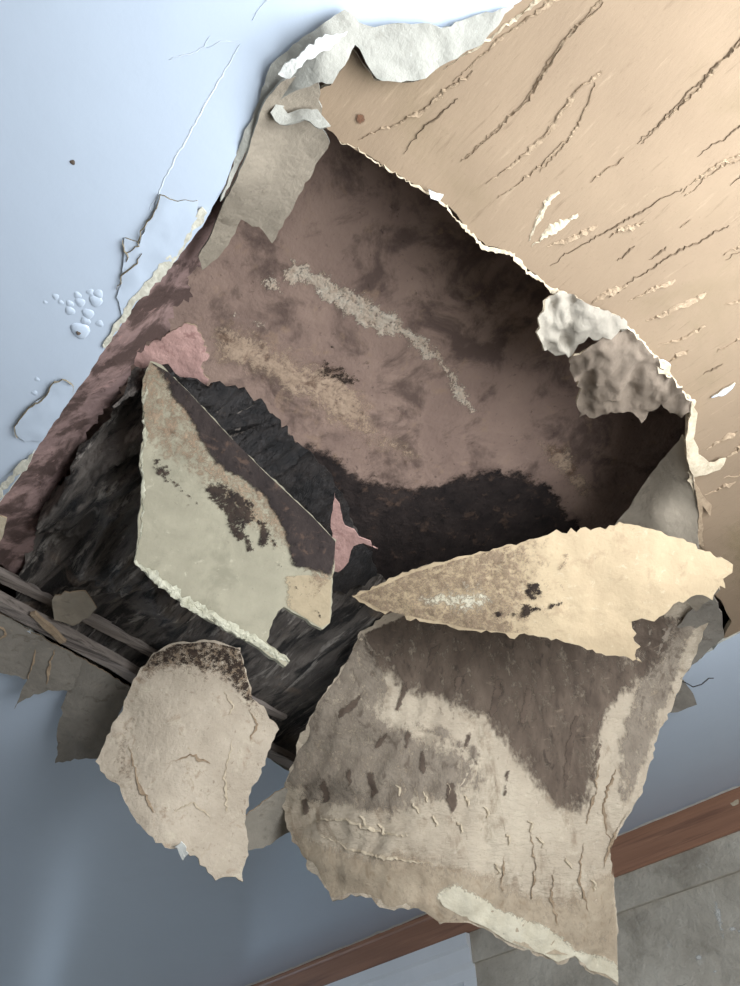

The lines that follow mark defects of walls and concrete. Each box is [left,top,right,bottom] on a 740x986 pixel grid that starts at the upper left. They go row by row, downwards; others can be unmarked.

crack [150,36,240,210]
peeling [102,6,514,349]
peeling [0,379,74,502]
water stain [143,362,335,628]
water stain [261,259,475,413]
flaking render [657,359,671,375]
water stain [143,642,257,707]
water stain [284,443,694,820]
peeling [174,841,189,860]
water stain [295,834,618,982]
peeling [617,786,740,836]